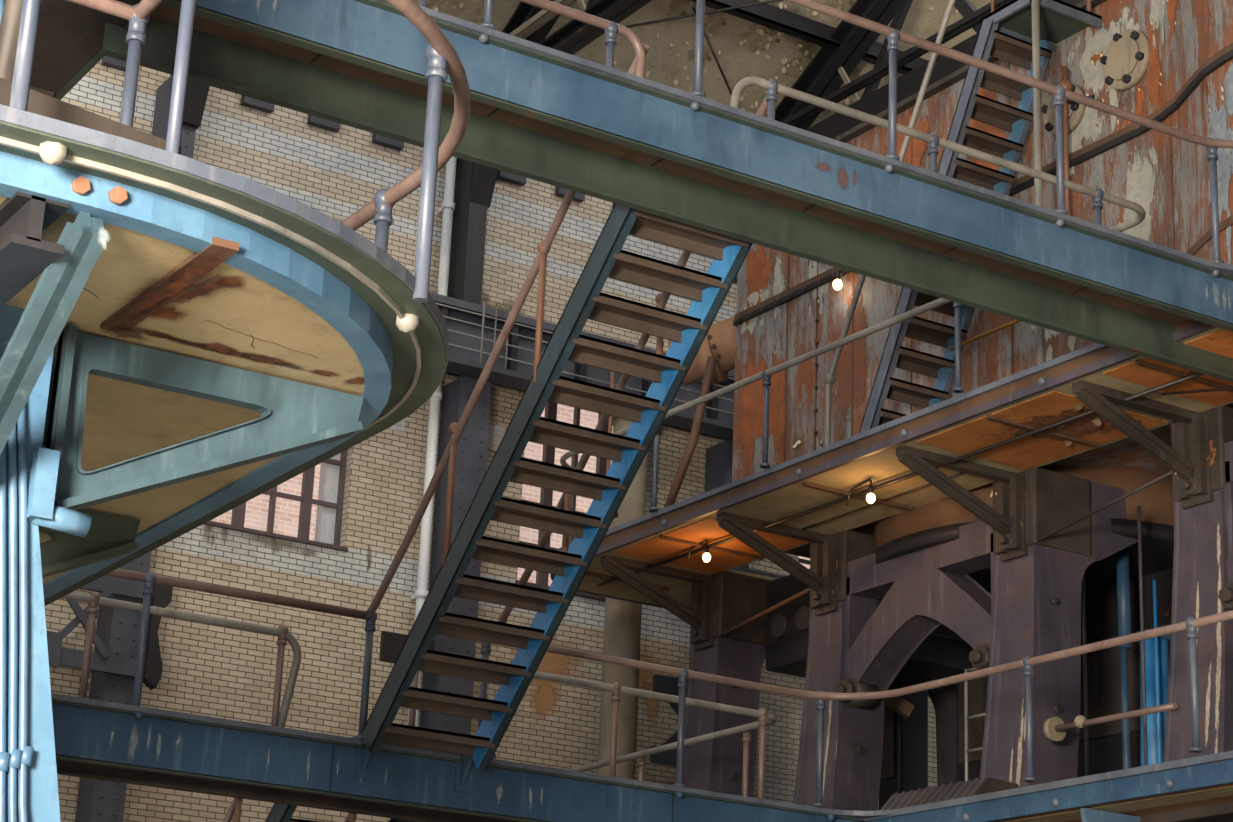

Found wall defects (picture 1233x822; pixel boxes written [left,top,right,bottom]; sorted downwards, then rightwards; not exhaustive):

peeling [1052,0,1166,176]
peeling [1118,146,1158,241]
peeling [1207,62,1233,264]
rust [103,256,365,384]
peeling [808,260,829,317]